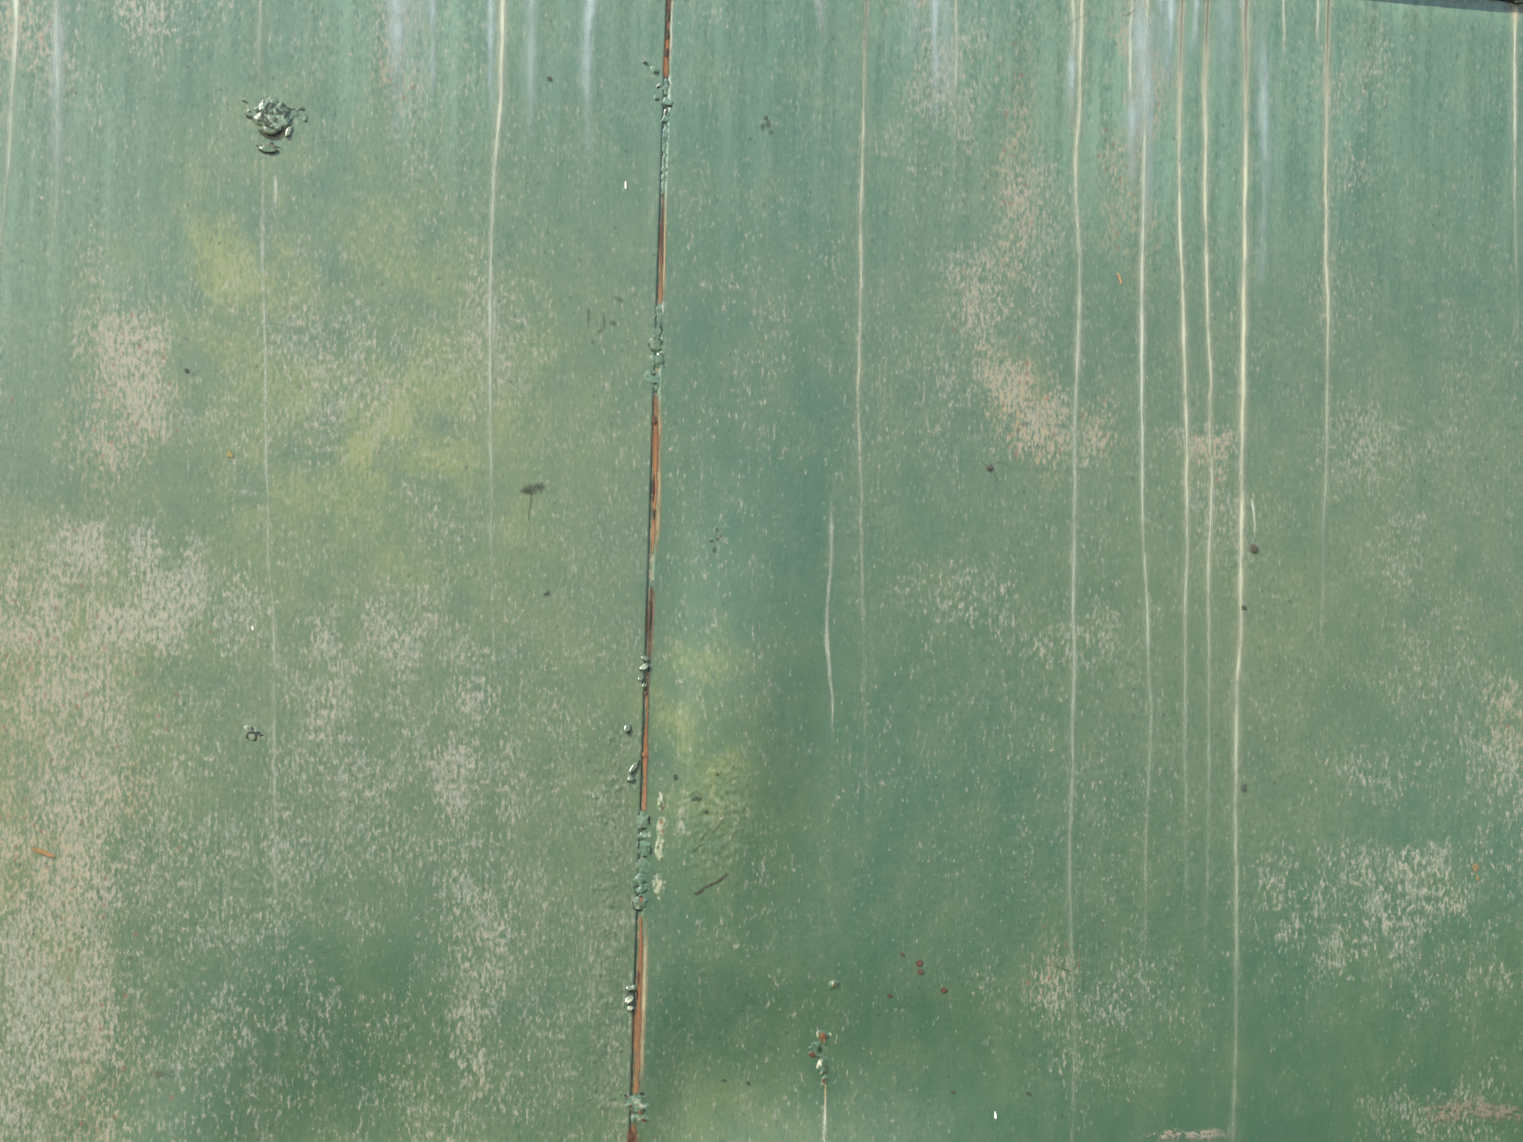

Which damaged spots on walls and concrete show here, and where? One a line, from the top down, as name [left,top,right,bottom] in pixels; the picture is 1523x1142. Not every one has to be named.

water stain [1,0,19,235]
corrosion [663,0,673,77]
water stain [1070,0,1084,248]
water stain [1316,0,1331,360]
corrosion [651,396,661,553]
water stain [1128,0,1212,732]
water stain [1234,0,1267,959]
corrosion [642,586,654,811]
corrosion [634,916,647,1094]